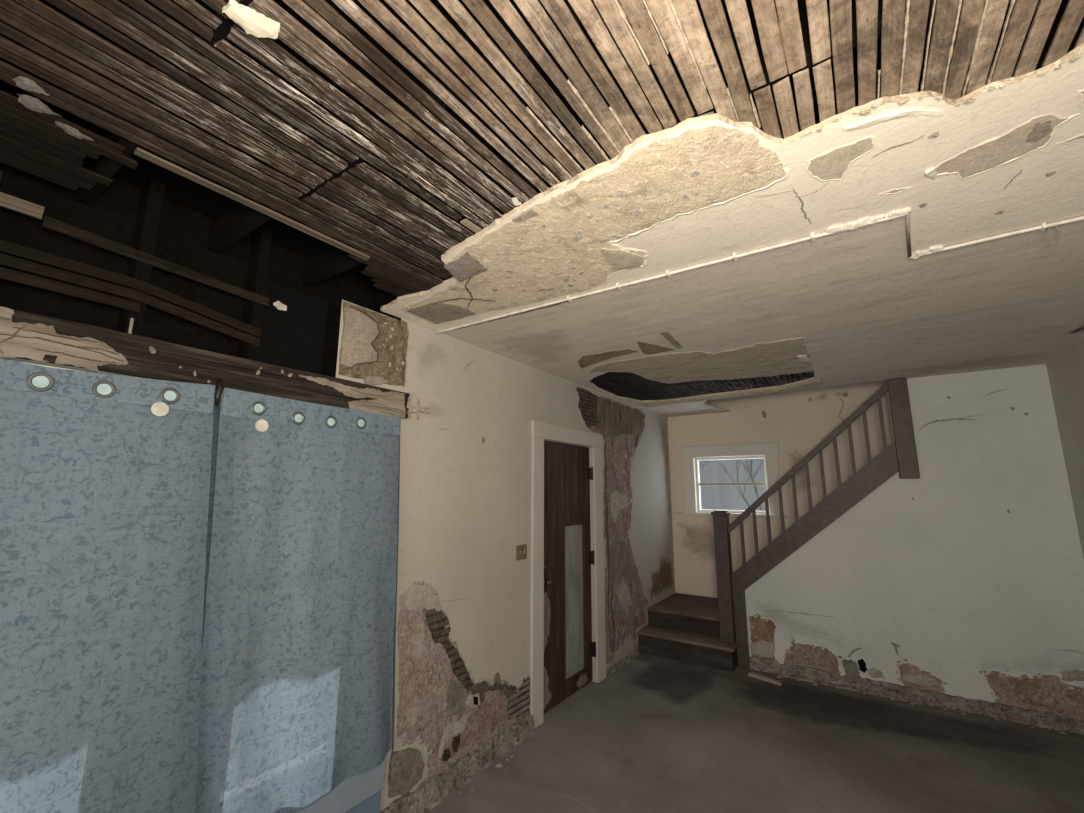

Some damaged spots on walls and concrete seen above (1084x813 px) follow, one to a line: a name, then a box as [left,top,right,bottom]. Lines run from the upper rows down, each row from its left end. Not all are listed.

peeling [805,109,943,182]
peeling [925,89,1084,180]
spalling [281,125,815,419]
peeling [0,306,129,373]
spalling [575,387,650,665]
spalling [396,580,531,781]
spalling [748,612,948,694]